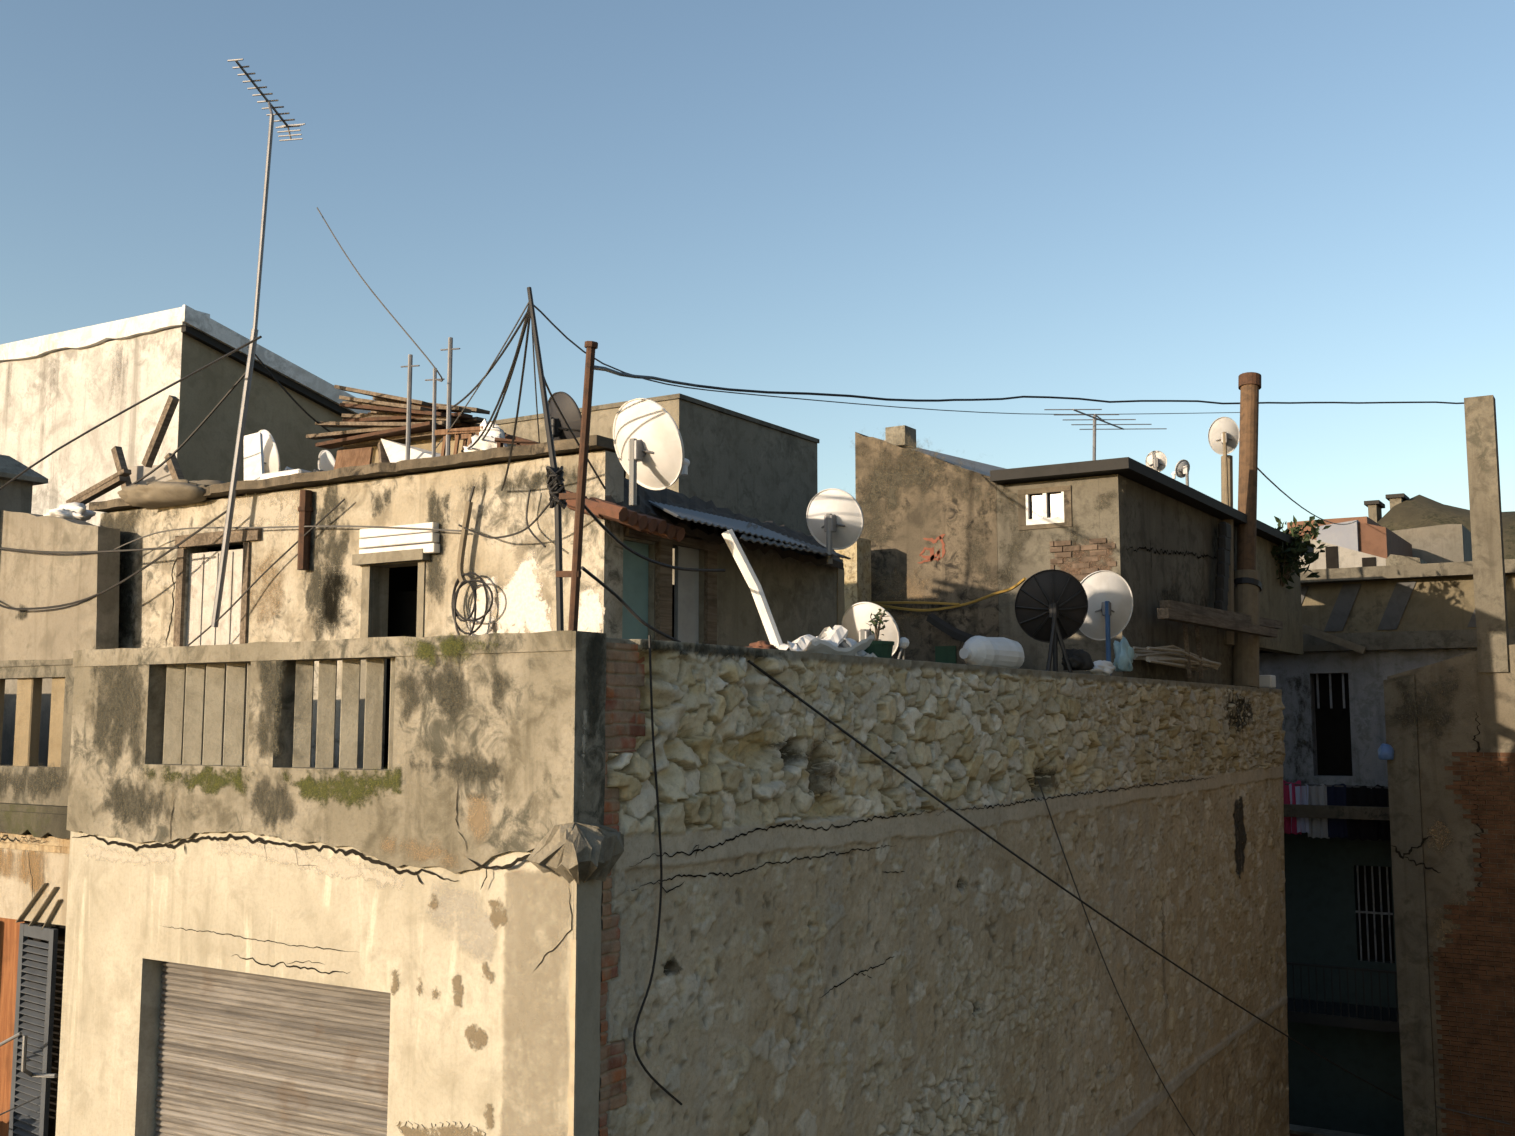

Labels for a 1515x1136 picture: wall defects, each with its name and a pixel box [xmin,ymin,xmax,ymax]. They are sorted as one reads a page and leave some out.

leakage [226,484,349,641]
peeling [468,557,552,636]
peeling [578,587,605,633]
leakage [93,511,169,822]
leakage [257,660,283,757]
crack [0,780,530,898]
leakage [251,780,293,827]
crack [627,776,1214,893]
crack [1388,836,1441,873]
crack [536,891,572,968]
spalling [417,975,464,1007]
spalling [396,1104,494,1136]